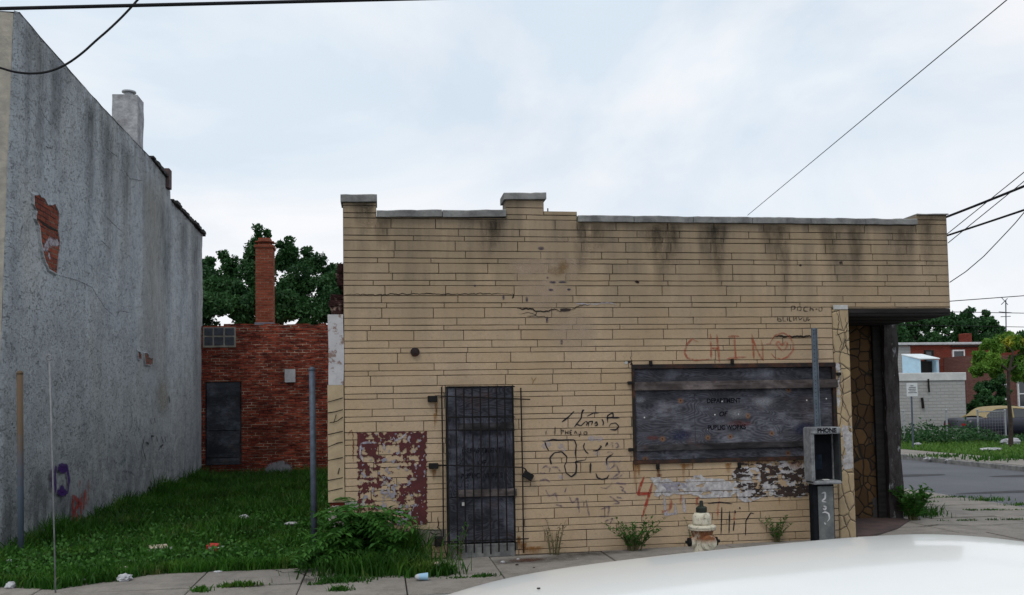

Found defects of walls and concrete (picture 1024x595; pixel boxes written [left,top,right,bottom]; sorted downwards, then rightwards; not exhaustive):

spalling [31,192,61,276]
crack [346,290,616,318]
peeling [328,431,446,545]
peeling [650,460,809,503]